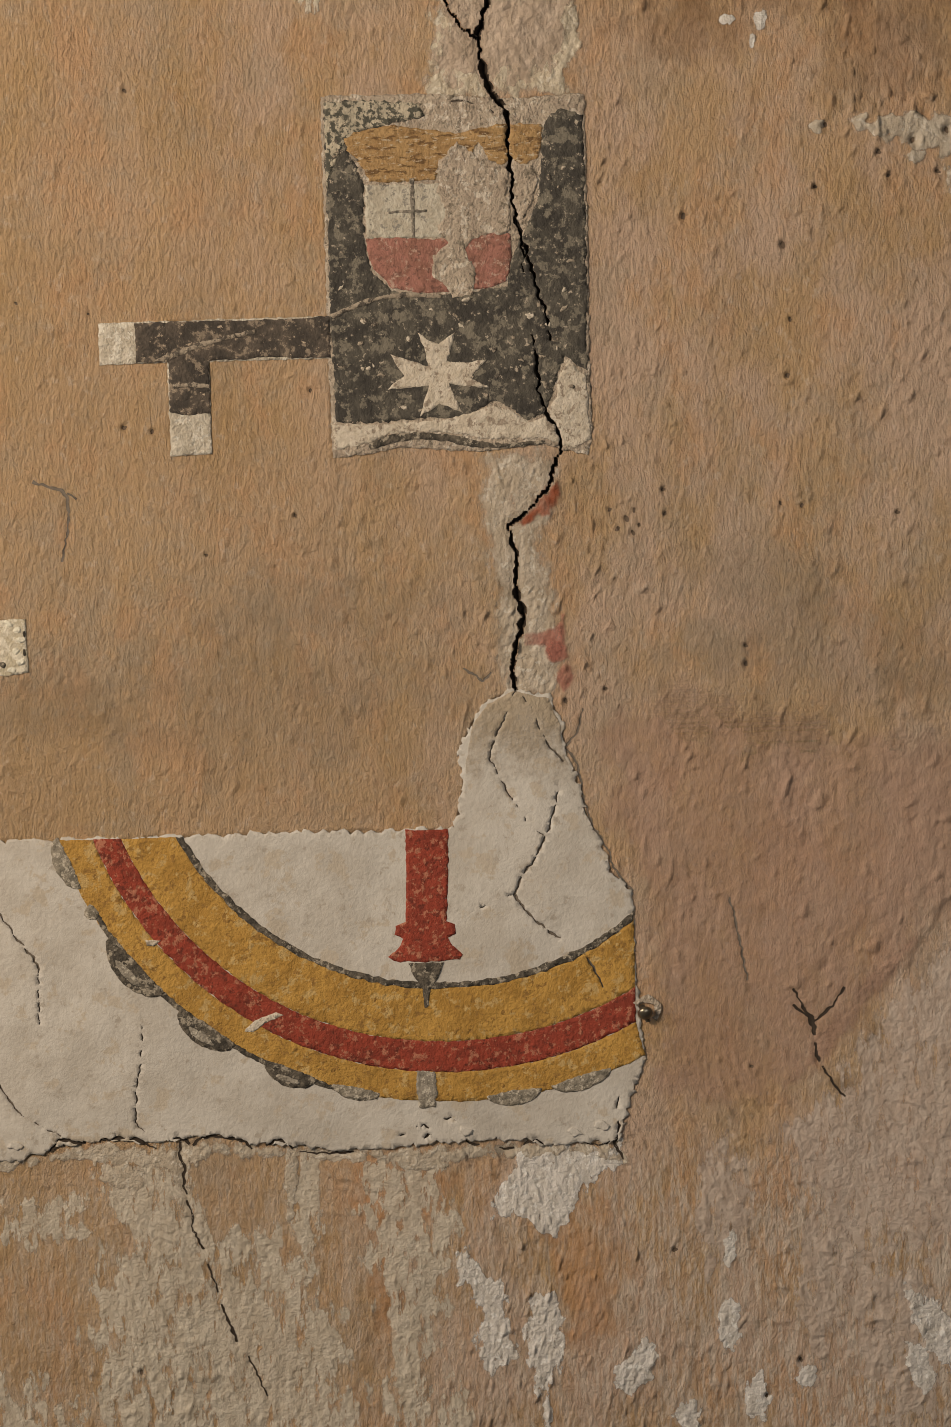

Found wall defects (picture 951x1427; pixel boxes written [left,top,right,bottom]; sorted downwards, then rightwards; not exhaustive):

flaking render [423,0,581,98]
crack [443,0,634,987]
flaking render [0,448,662,1427]
crack [792,986,846,1097]
crack [0,1027,354,1395]
crack [400,1117,544,1150]
peeling [695,1133,755,1281]
peeling [779,942,951,1427]
peeling [717,1297,743,1355]
peeling [658,1399,703,1427]
peeling [745,1369,773,1422]